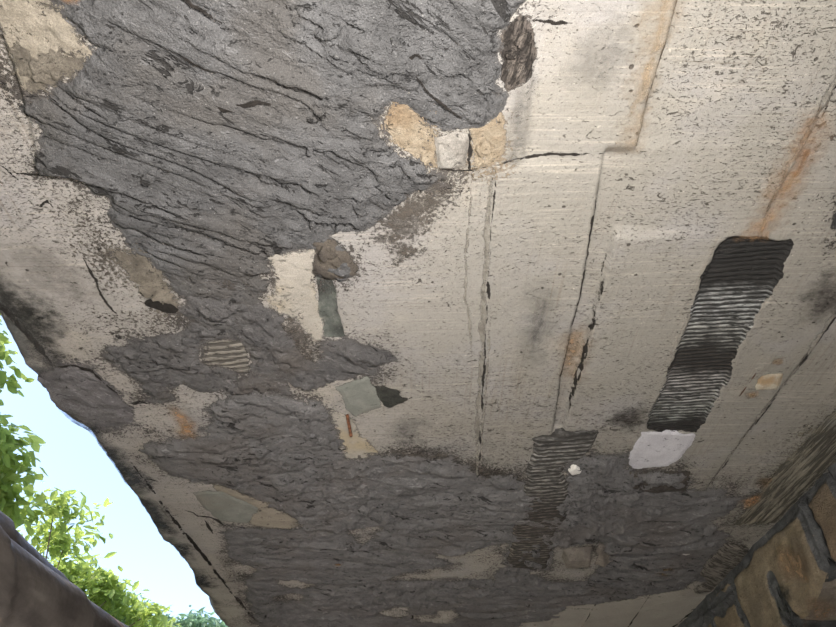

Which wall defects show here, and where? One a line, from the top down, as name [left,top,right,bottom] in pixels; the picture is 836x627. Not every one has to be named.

crack [410,54,607,426]
spalling [808,193,836,260]
crack [794,317,836,374]
peeling [755,373,783,390]
crack [131,462,255,620]